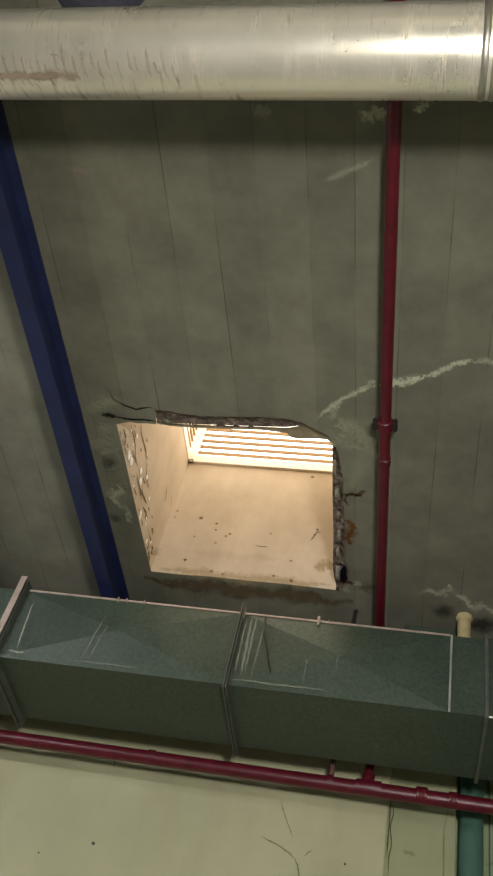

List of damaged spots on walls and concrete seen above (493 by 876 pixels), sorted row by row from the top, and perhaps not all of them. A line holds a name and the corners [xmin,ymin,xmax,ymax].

spalling [58,0,145,8]
crack [102,391,154,421]
crack [318,359,489,419]
crack [265,806,299,876]